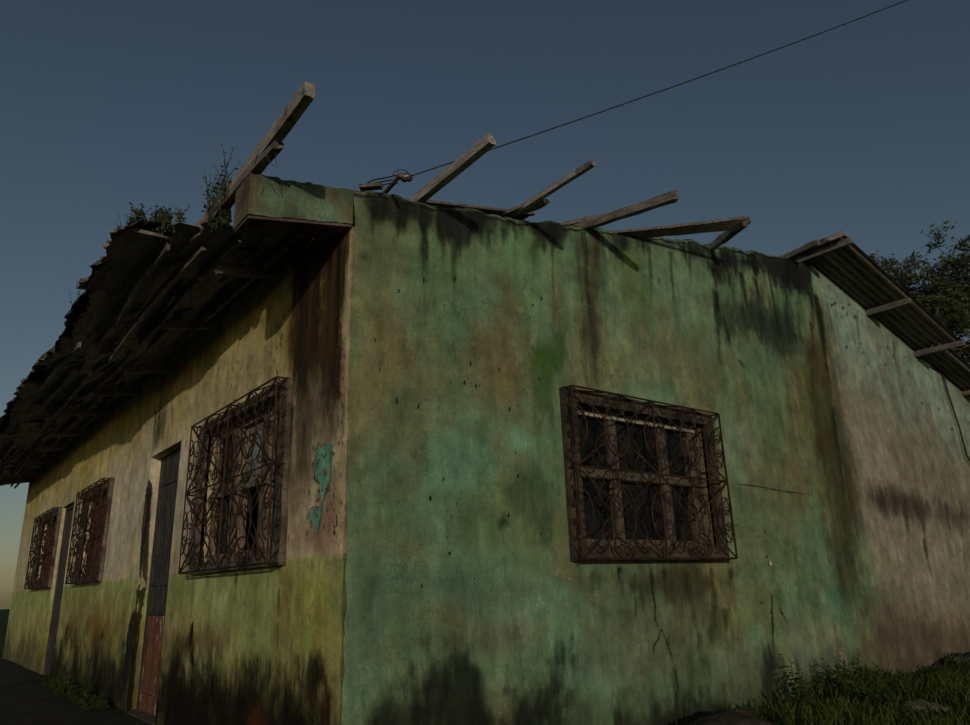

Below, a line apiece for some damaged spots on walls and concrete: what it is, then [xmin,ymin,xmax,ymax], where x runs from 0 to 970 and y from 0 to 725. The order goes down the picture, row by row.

water stain [366,191,567,261]
water stain [579,229,604,359]
peeling [306,436,343,541]
water stain [46,626,124,707]
water stain [156,630,330,725]
water stain [371,654,563,725]